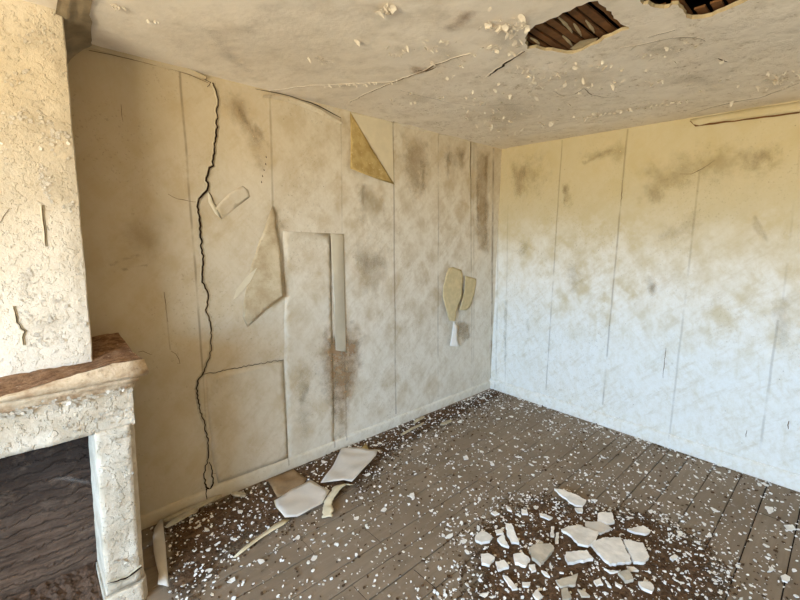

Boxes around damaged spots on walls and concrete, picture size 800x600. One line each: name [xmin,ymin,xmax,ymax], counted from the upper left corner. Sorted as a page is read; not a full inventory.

crack [257,54,483,118]
crack [485,51,525,77]
crack [170,70,282,499]